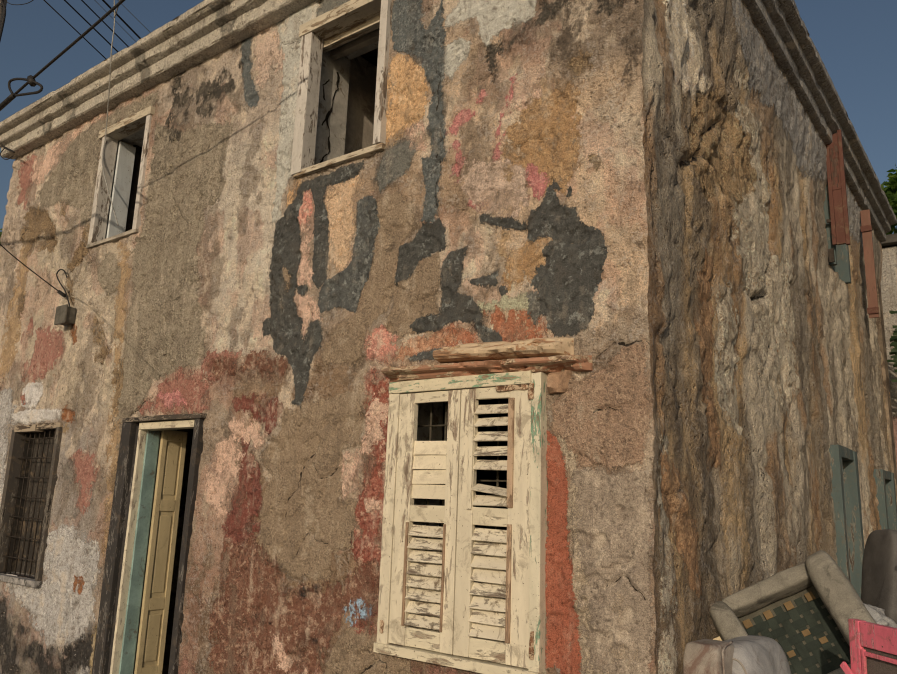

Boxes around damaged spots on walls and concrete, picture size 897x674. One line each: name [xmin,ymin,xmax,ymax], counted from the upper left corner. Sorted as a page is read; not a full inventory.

crack [320,72,340,163]
crack [597,340,650,357]
spalling [61,404,75,434]
crack [285,453,338,517]